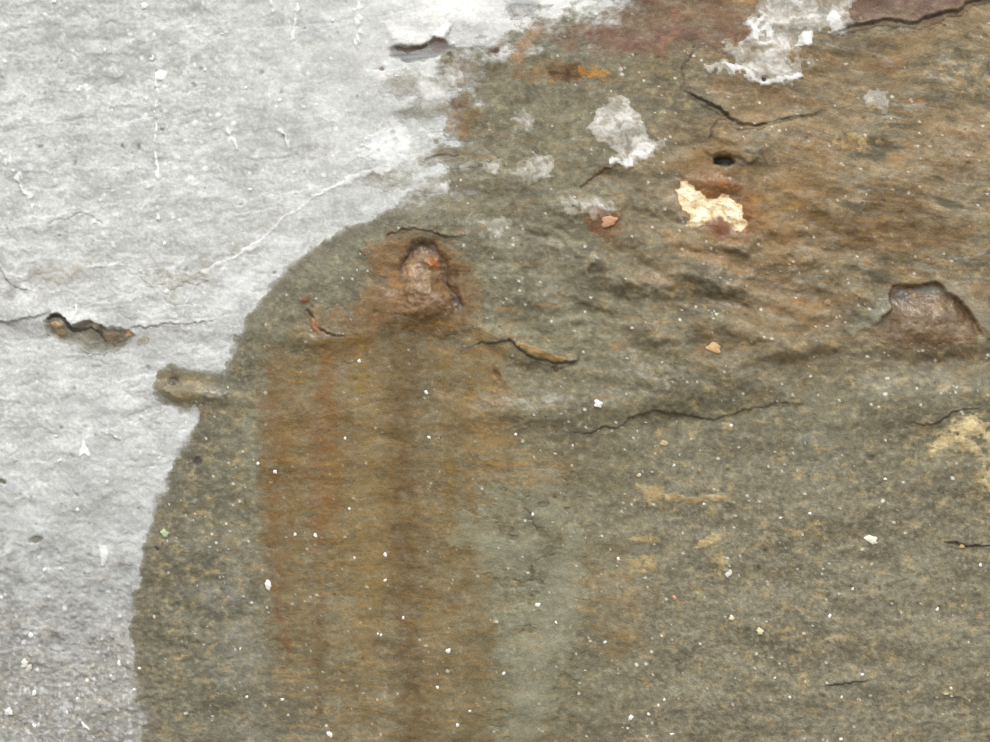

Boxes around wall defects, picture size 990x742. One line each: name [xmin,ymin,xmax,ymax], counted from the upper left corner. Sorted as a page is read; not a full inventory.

spalling [387,25,451,63]
water stain [703,0,857,87]
crack [832,0,990,36]
crack [678,43,827,139]
efflorescence [586,95,666,170]
spalling [675,181,747,240]
crack [87,261,213,331]
spalling [42,312,136,356]
crack [454,336,581,369]
corrosion [228,218,582,742]
water stain [217,563,327,742]
water stain [487,522,591,742]